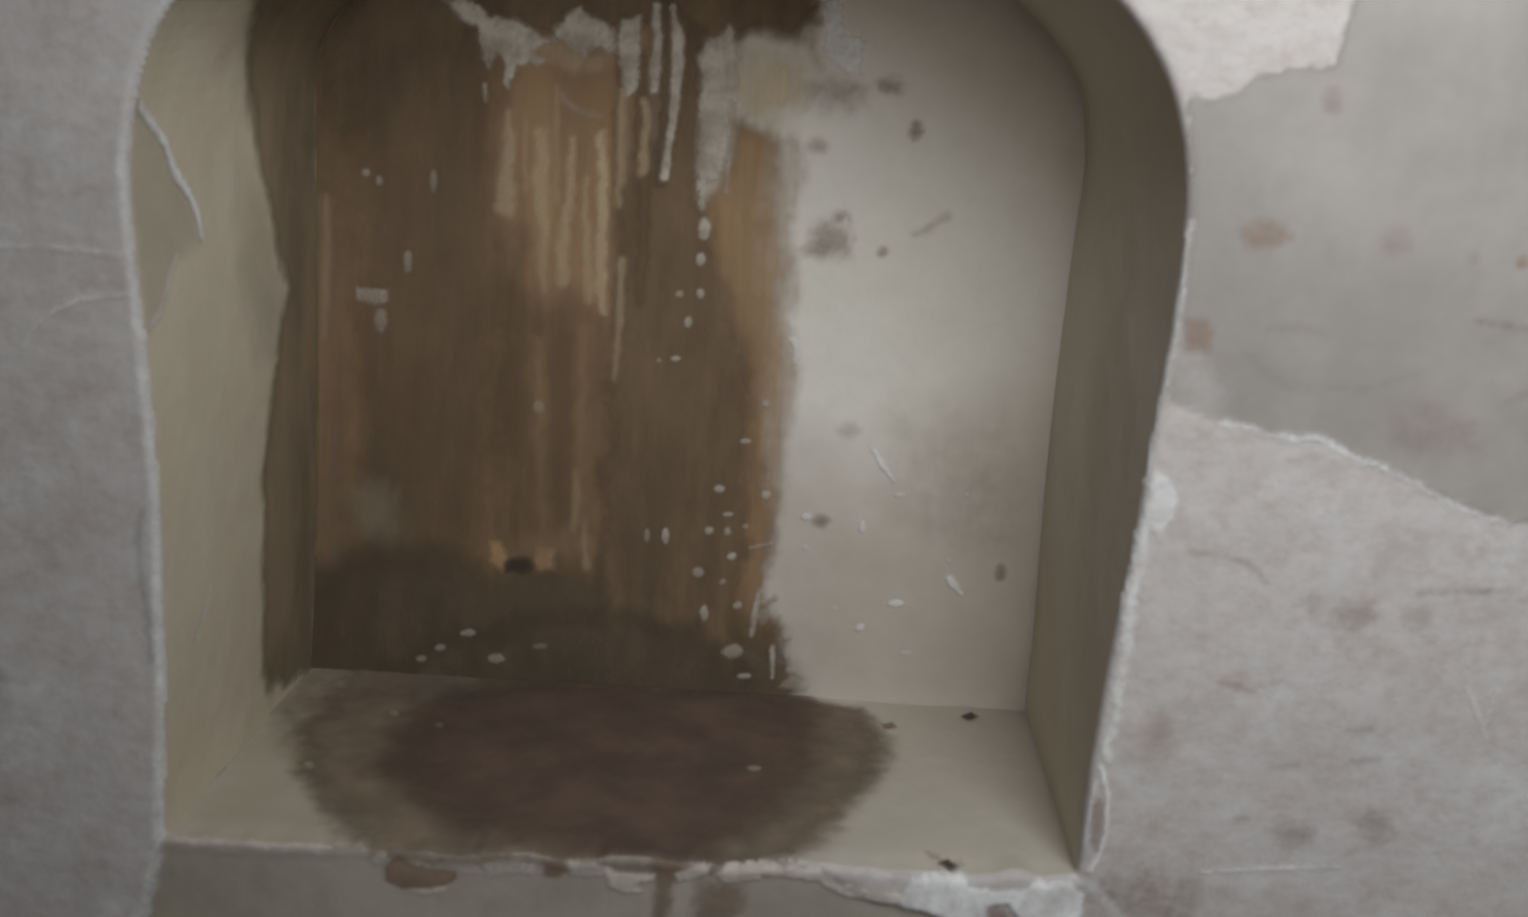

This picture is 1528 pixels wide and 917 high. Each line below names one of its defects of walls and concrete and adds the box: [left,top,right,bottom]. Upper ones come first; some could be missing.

crack [138,99,203,239]
flaking render [1176,0,1528,523]
leakage [249,0,881,917]
flaking render [490,542,553,571]
spalling [726,594,760,655]
spalling [1085,435,1176,873]
flaking render [142,756,1083,917]